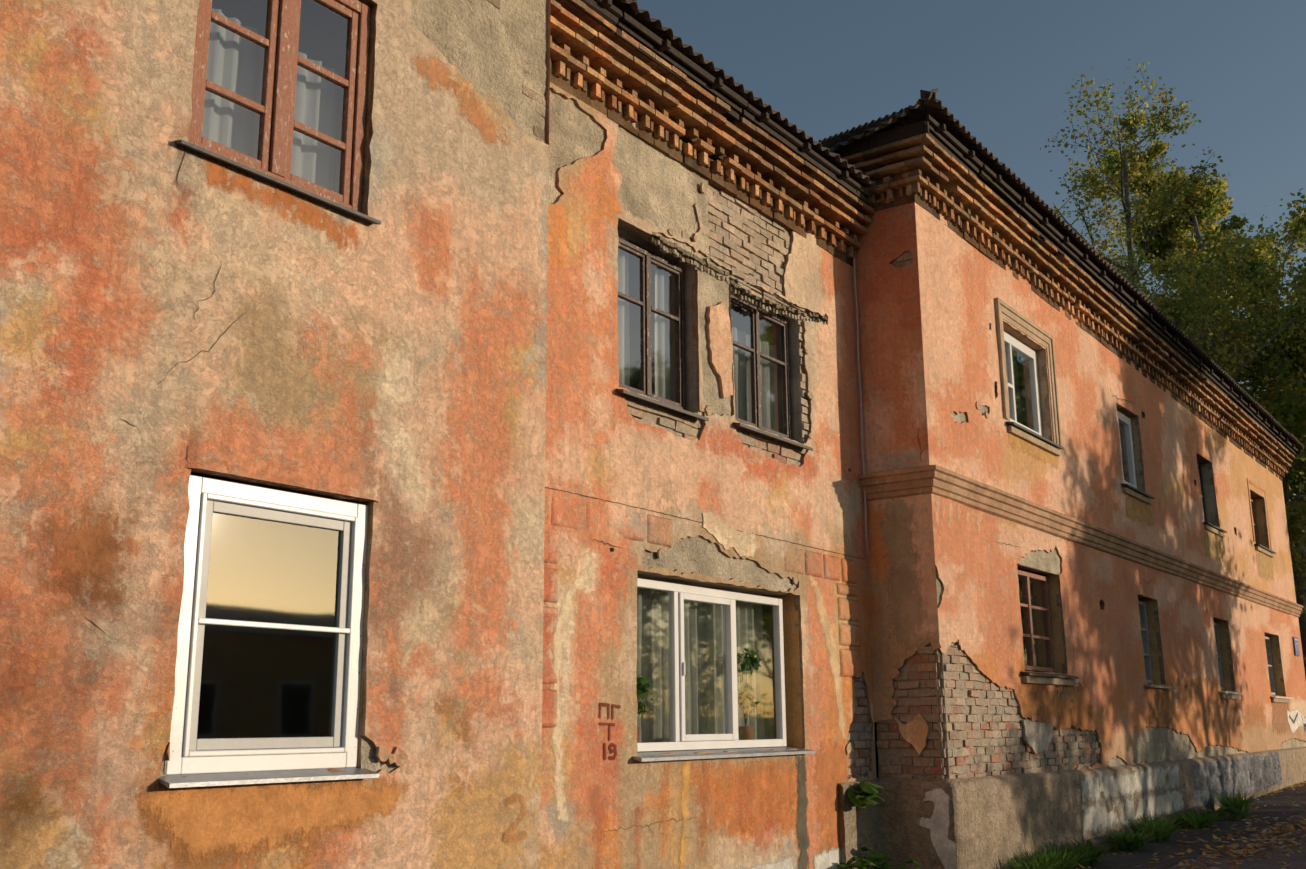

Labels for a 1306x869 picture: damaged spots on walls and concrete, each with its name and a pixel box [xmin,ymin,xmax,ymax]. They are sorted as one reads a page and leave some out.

flaking render [410,0,813,466]
crack [158,261,245,384]
flaking render [642,513,798,600]
flaking render [361,736,409,772]
flaking render [845,639,1247,869]
leakage [130,777,409,863]